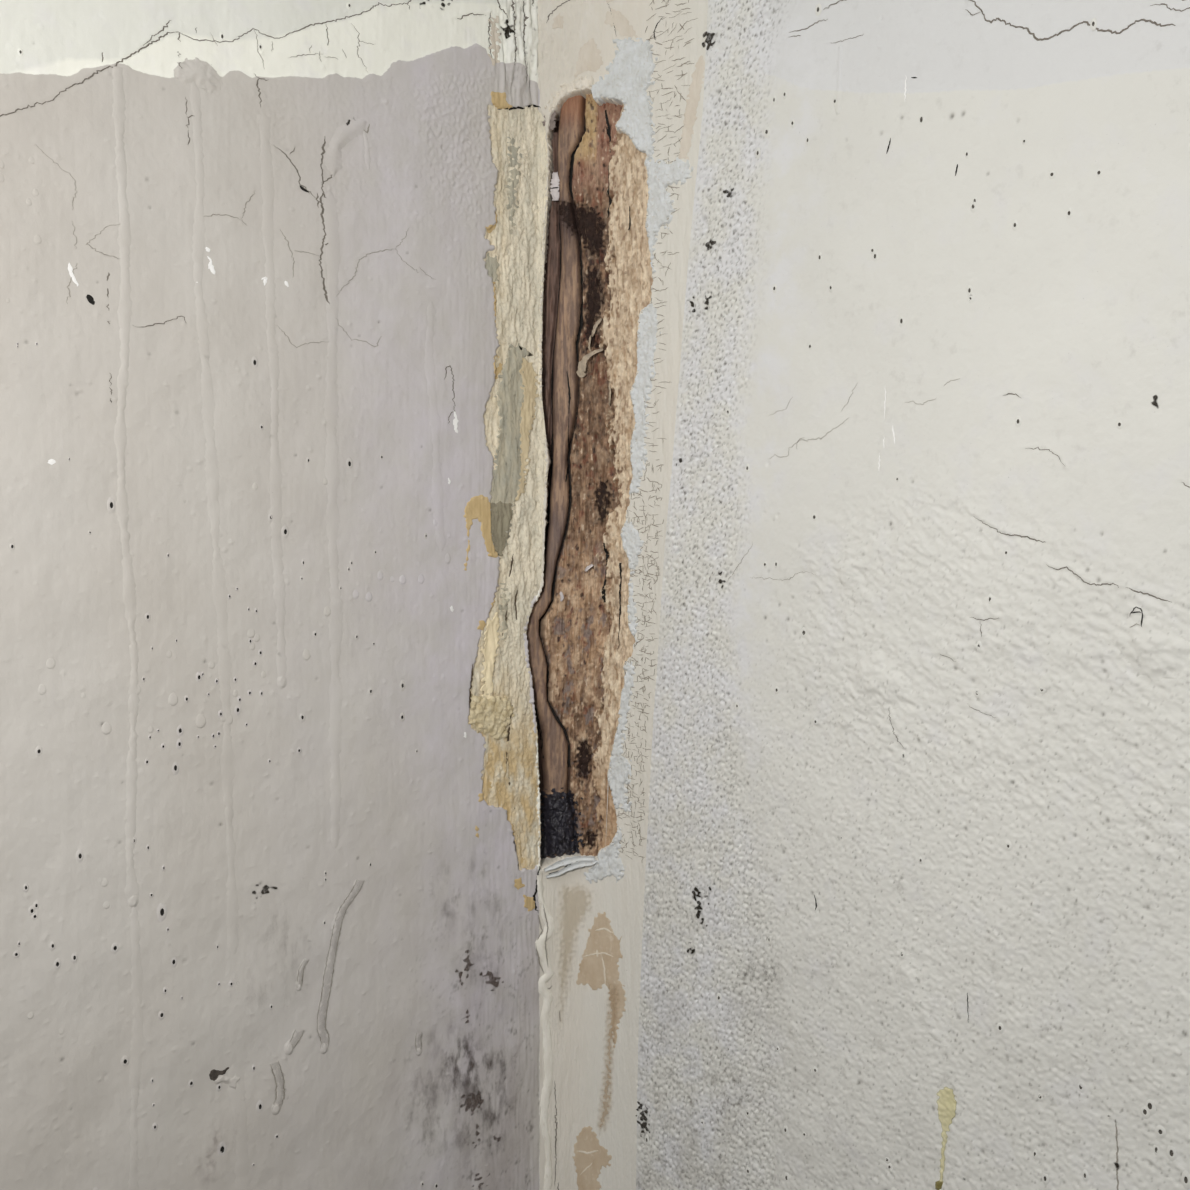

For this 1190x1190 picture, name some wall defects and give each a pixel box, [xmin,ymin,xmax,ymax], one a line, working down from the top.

crack [0,0,411,117]
crack [457,0,570,80]
crack [789,0,861,43]
crack [965,0,1190,41]
crack [37,146,186,327]
crack [211,193,255,223]
crack [276,139,432,348]
crack [445,366,456,424]
spalling [464,37,705,911]
crack [610,0,697,860]
water stain [600,995,615,1126]